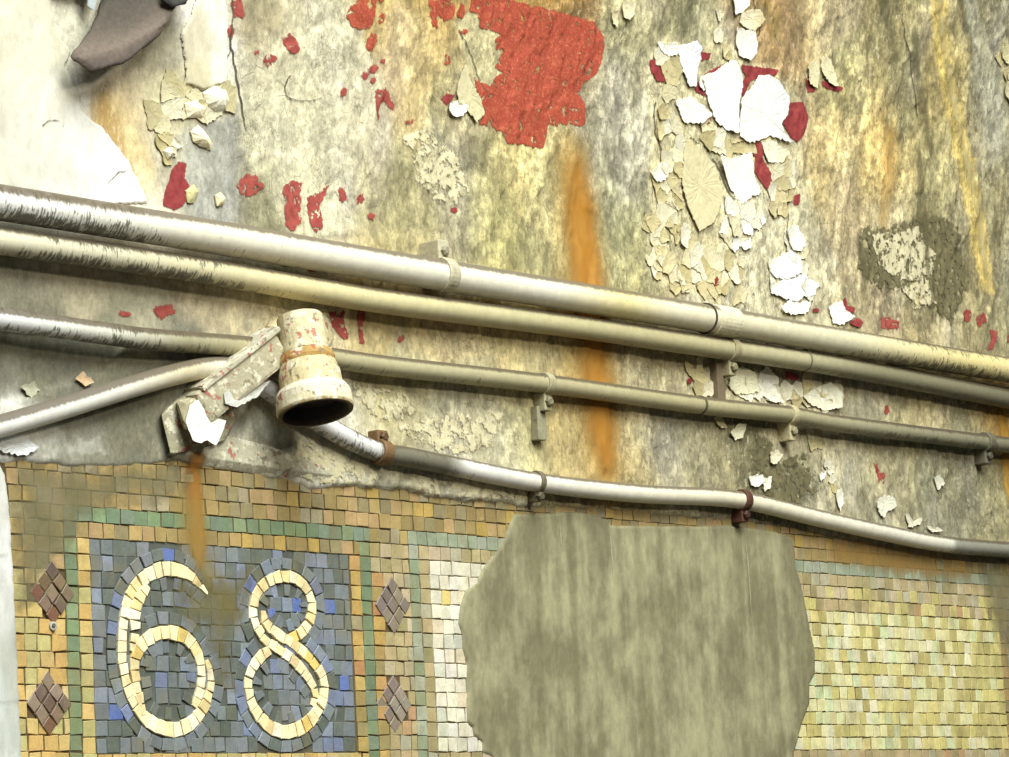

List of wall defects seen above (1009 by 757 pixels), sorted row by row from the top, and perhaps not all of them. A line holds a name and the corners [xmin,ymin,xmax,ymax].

flaking render [0,0,147,204]
flaking render [143,0,245,210]
peeling [282,179,365,232]
peeling [346,0,386,51]
peeling [428,0,605,148]
rust [565,150,600,286]
peeling [642,0,863,327]
flaking render [857,214,1009,351]
rust [579,339,612,383]
rust [586,399,616,482]
peeling [728,366,844,413]
rust [187,453,205,566]